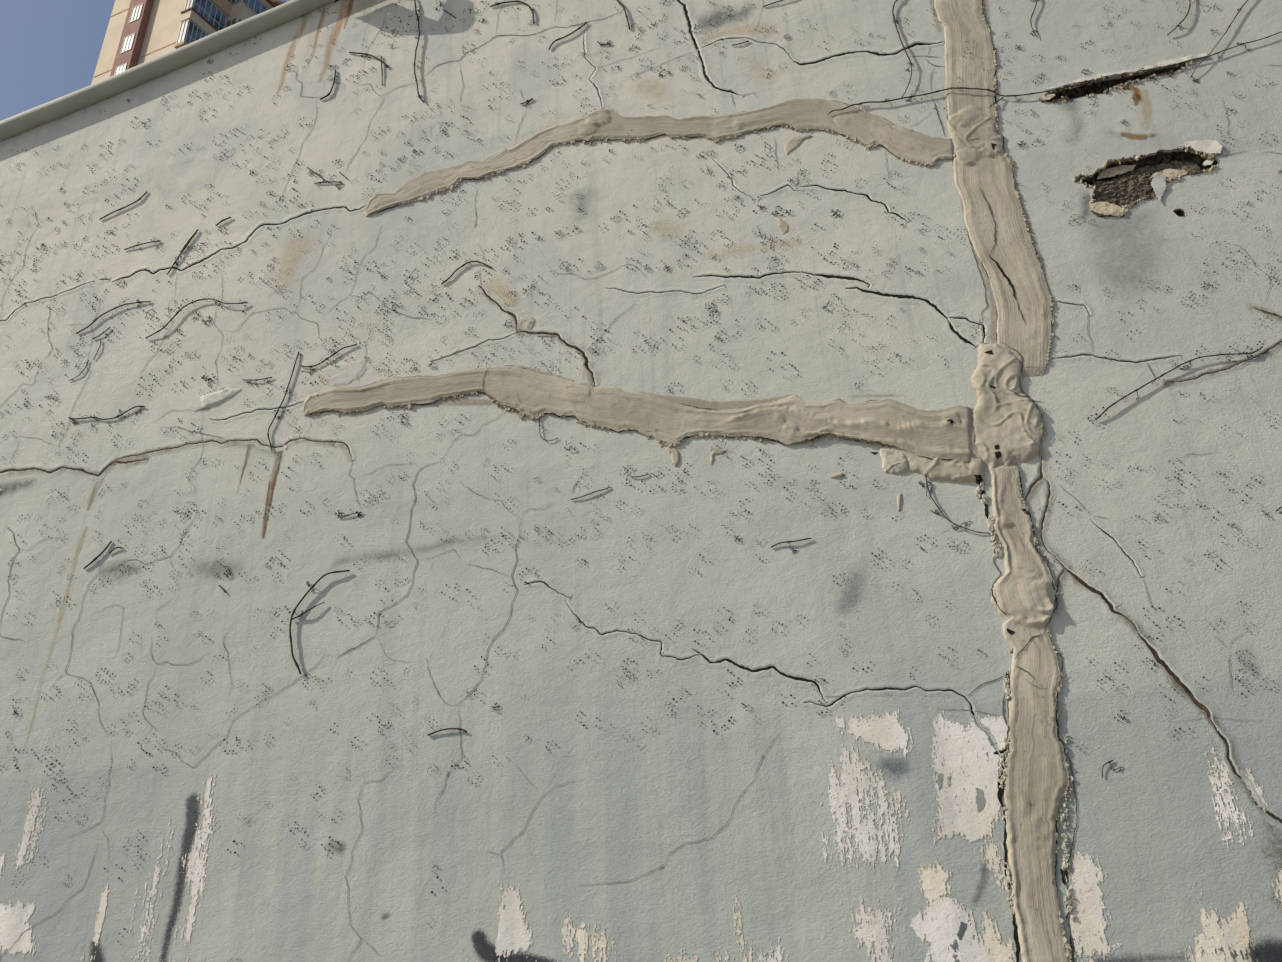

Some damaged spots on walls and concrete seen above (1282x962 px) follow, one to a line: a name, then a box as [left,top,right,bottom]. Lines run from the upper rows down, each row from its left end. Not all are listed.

spalling [1039,53,1207,103]
crack [709,156,911,224]
spalling [1074,139,1223,218]
crack [1163,334,1282,386]
crack [0,412,359,503]
rust [263,451,282,538]
crack [1064,489,1157,614]
crack [338,419,550,812]
peeling [820,709,916,872]
peeling [840,711,1016,962]
peeling [1064,850,1121,962]
peeling [1183,883,1258,962]